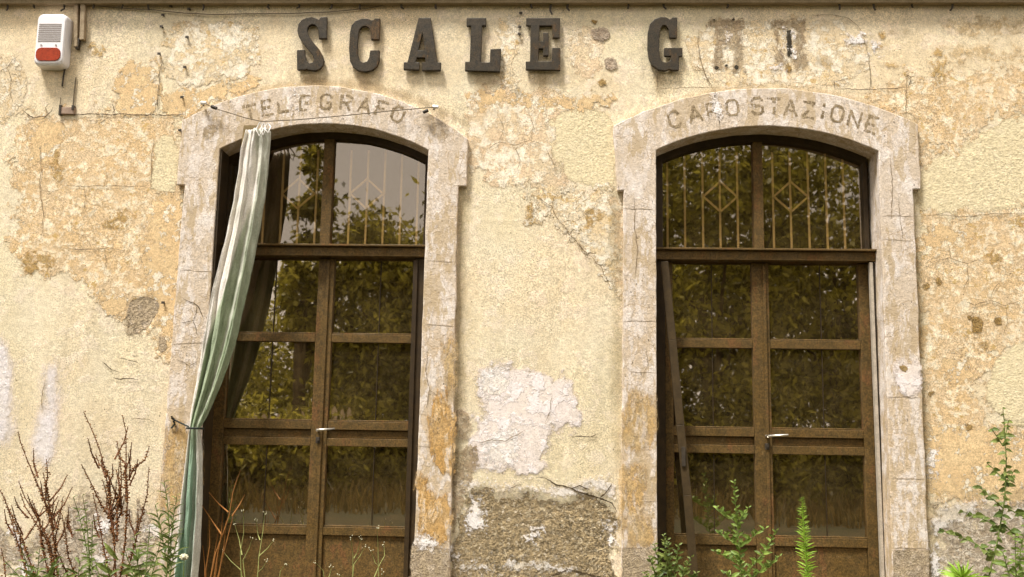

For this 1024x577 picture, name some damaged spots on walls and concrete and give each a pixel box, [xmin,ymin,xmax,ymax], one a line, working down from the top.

peeling [0,11,262,364]
peeling [464,7,623,300]
crack [490,112,611,288]
peeling [864,16,1024,170]
peeling [468,360,582,475]
spalling [450,487,621,577]
crack [509,477,616,509]